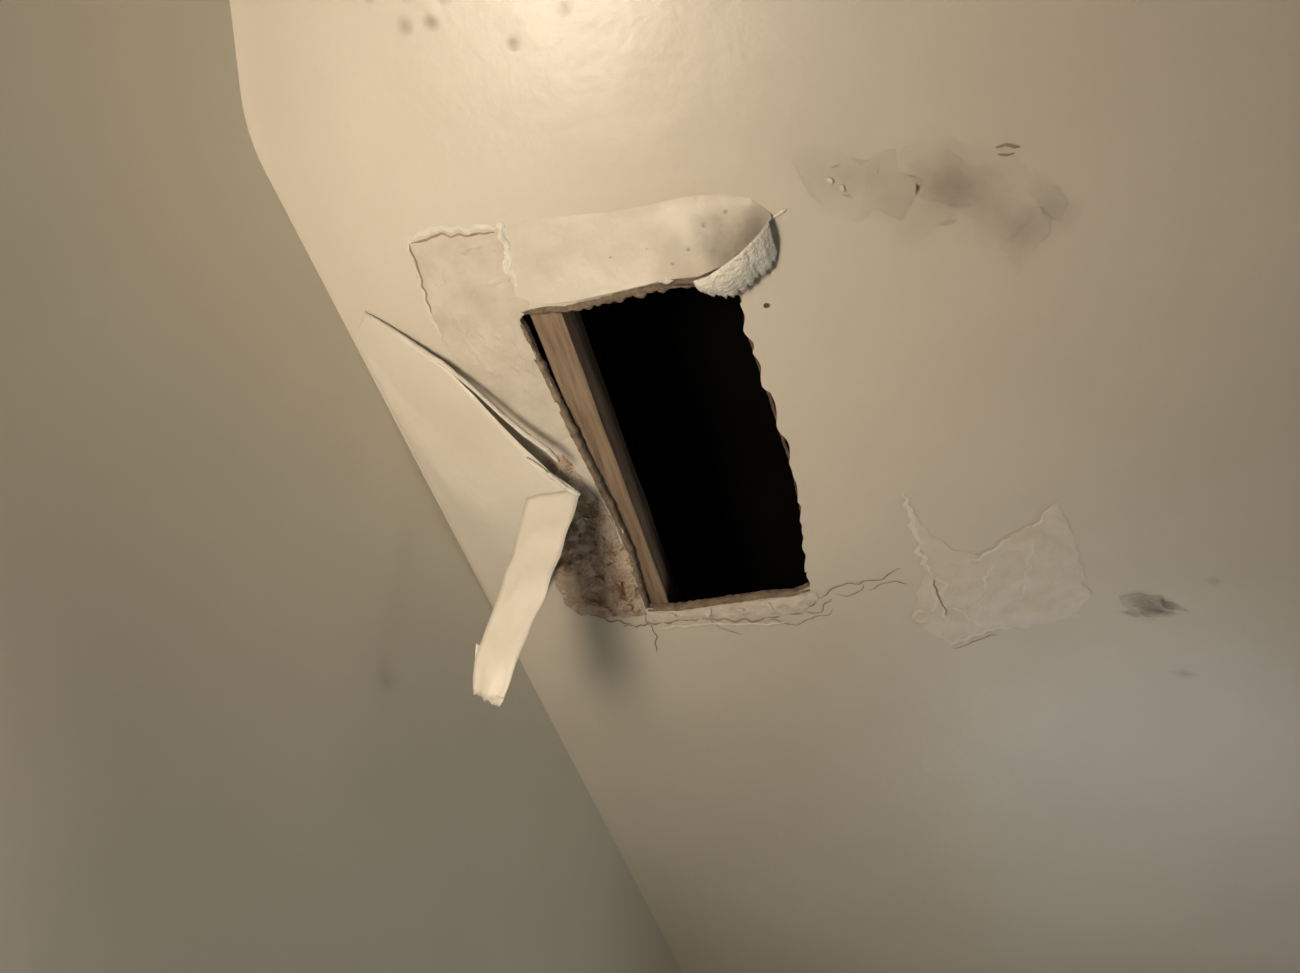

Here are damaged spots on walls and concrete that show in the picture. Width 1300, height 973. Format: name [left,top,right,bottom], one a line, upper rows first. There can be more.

peeling [356,208,818,707]
crack [592,568,905,652]